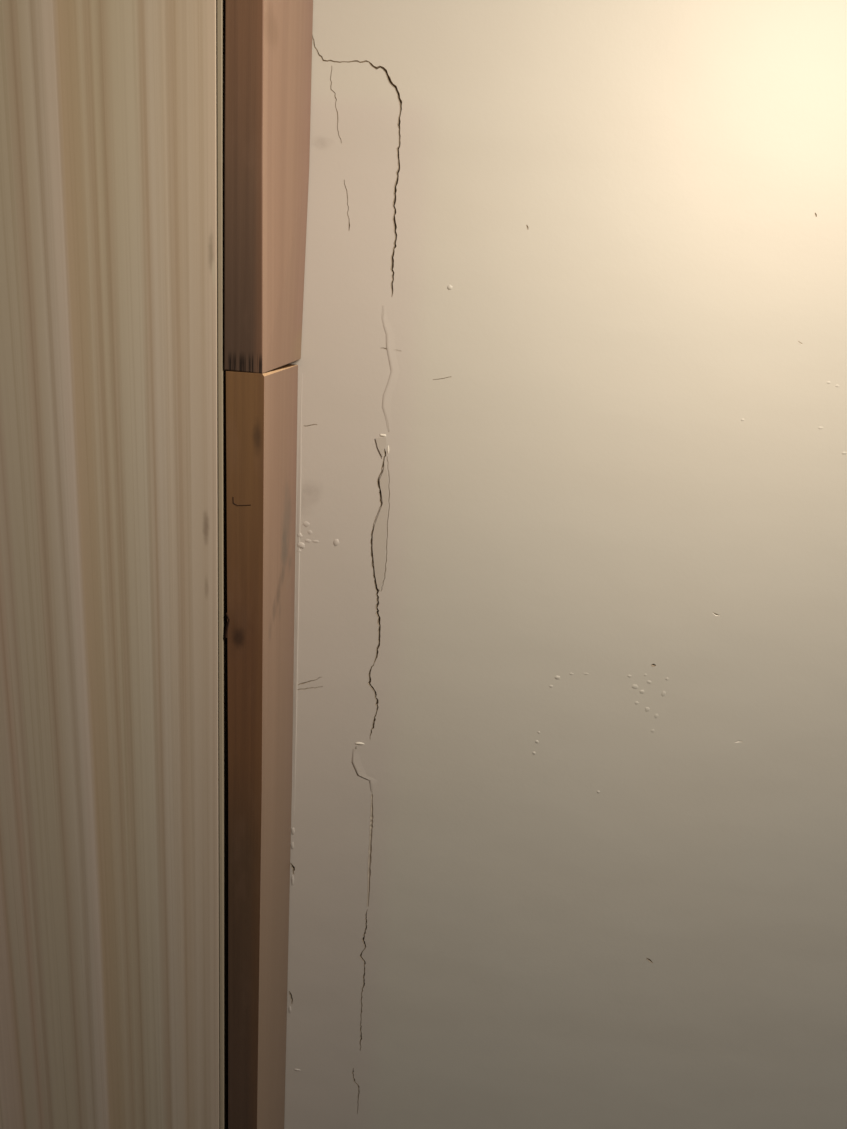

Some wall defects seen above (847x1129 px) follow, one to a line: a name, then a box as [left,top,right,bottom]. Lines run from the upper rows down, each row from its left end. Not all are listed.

crack [312,35,402,310]
crack [355,421,390,771]
crack [352,794,374,1114]